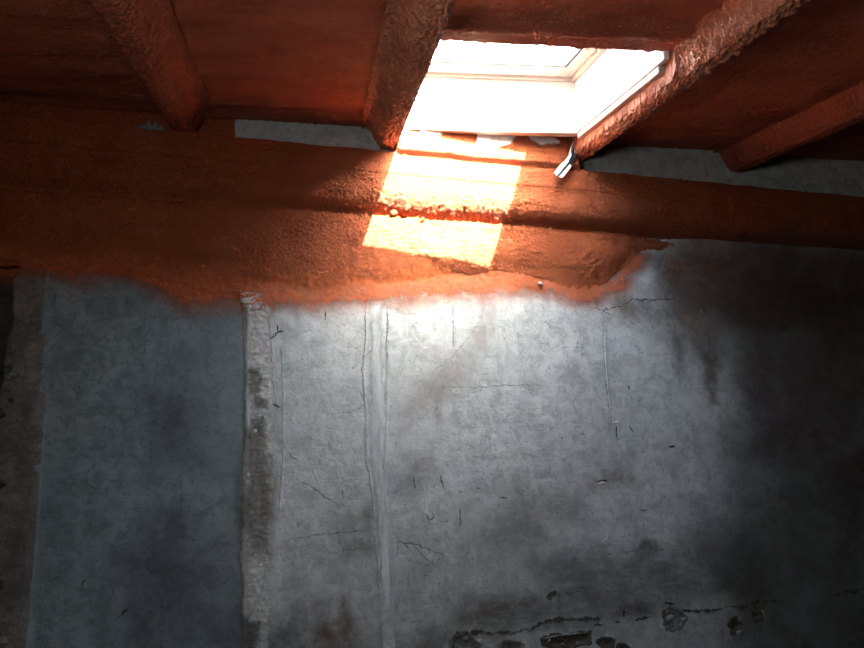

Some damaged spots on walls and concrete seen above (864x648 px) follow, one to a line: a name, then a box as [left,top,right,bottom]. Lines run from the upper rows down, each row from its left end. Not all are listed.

crack [581,298,678,428]
crack [289,451,337,503]
crack [280,530,446,566]
crack [466,587,648,636]
crack [665,602,737,614]